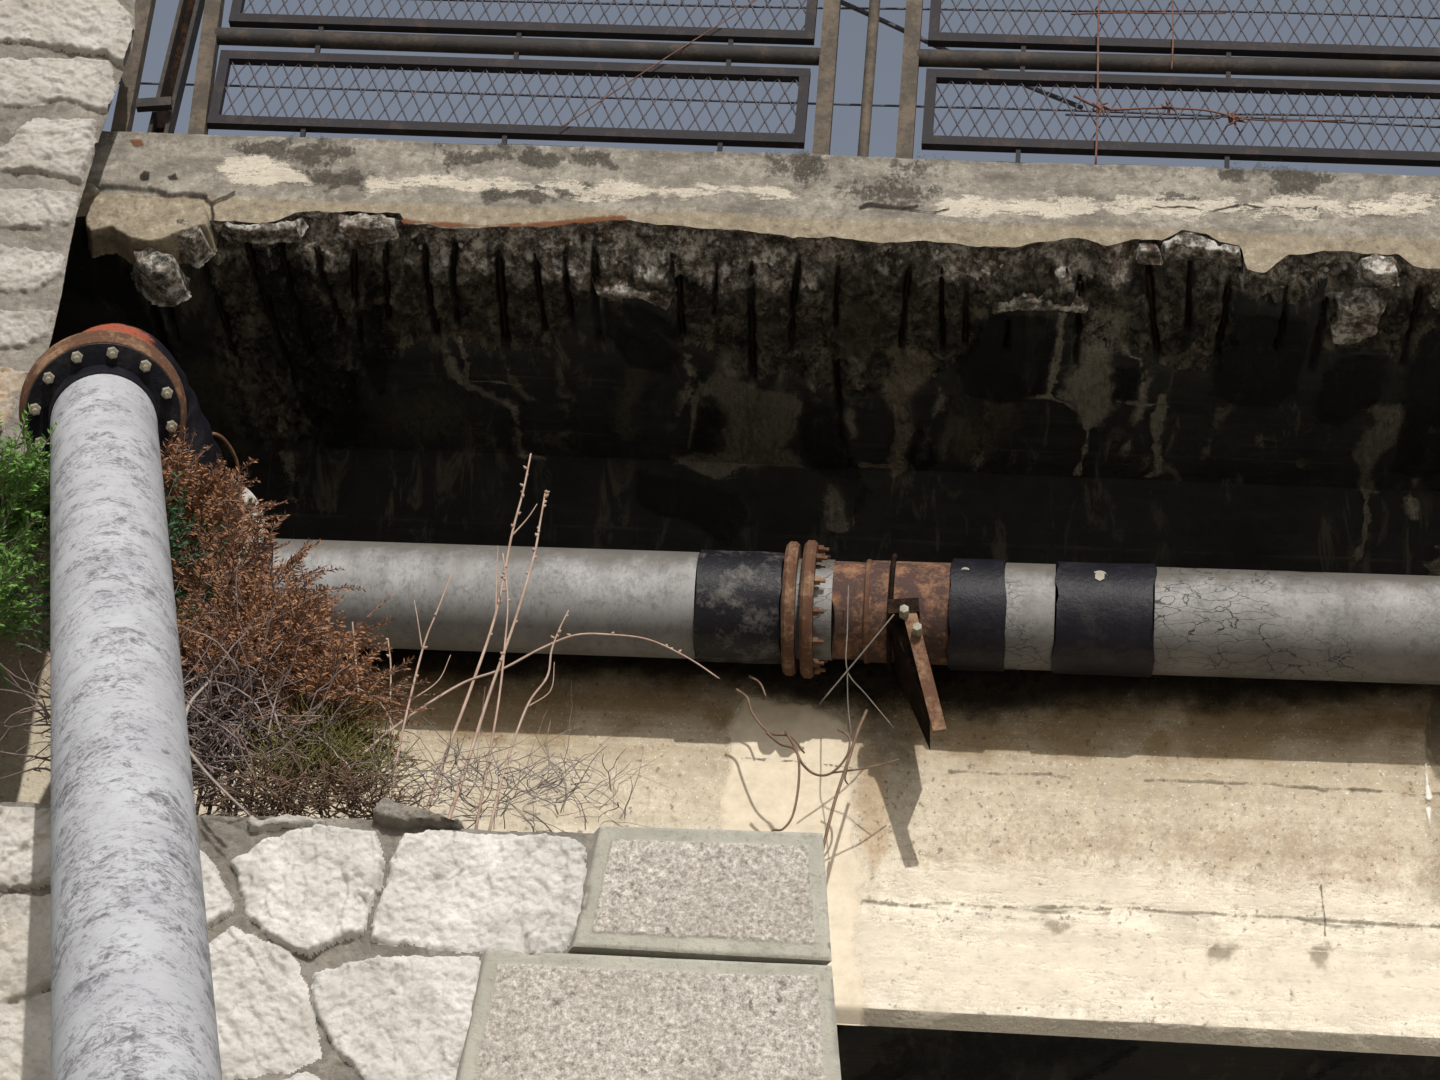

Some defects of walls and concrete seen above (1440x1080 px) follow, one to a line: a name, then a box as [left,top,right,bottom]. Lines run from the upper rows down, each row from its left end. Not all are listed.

peeling [78,182,100,211]
crack [95,184,236,228]
leakage [63,225,172,355]
leakage [182,231,407,460]
leakage [604,277,824,480]
spalling [130,211,1440,443]
leakage [844,339,936,477]
leakage [956,305,1168,478]
leakage [1350,404,1406,561]
leakage [930,664,1440,717]
leakage [342,647,908,1026]
crack [862,884,1440,936]